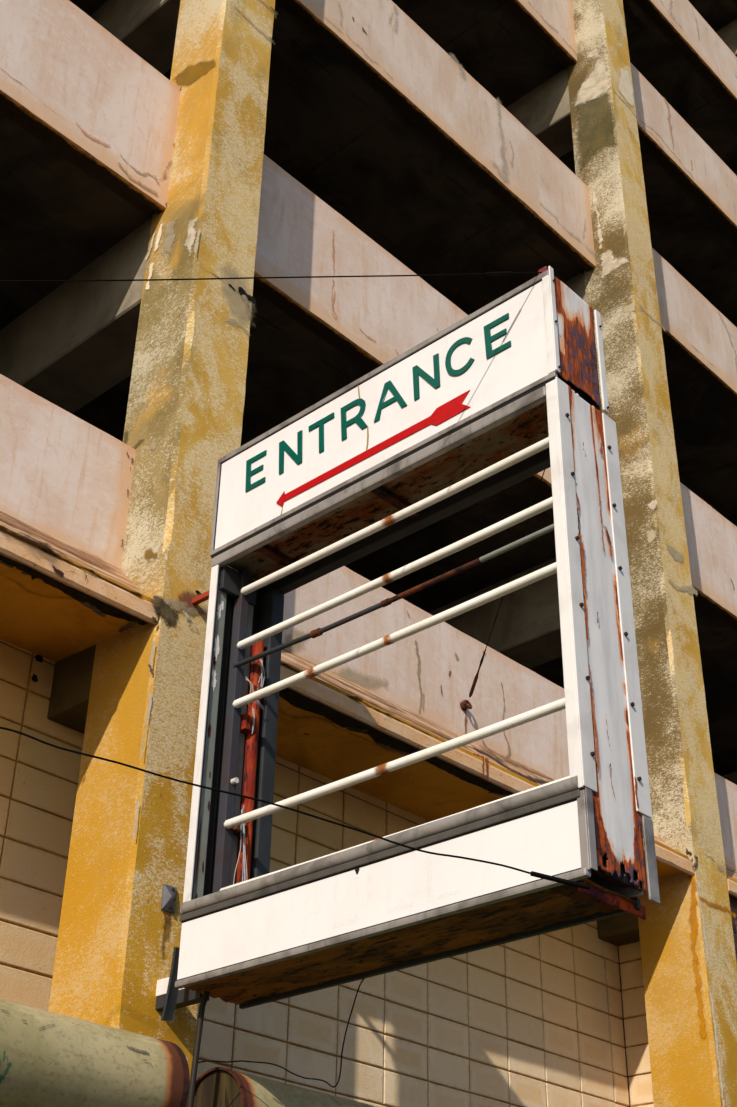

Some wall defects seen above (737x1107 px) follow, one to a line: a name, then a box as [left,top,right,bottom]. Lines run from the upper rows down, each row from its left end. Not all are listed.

water stain [577,94,616,169]
peeling [145,217,201,290]
water stain [224,269,250,336]
corrosion [583,410,613,557]
water stain [0,514,142,597]
peeling [0,554,208,633]
corrosion [576,493,598,639]
crack [414,640,424,714]
corrosion [589,665,615,797]
corrosion [594,817,606,852]